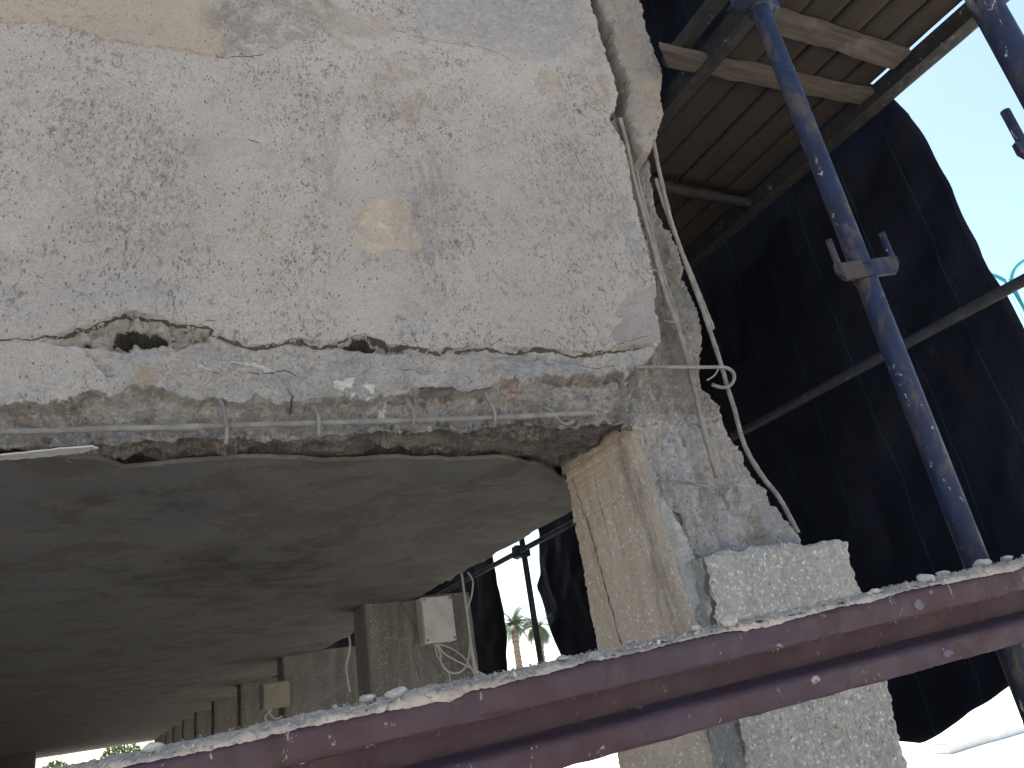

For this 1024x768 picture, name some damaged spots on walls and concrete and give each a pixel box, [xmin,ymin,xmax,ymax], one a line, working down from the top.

crack [0,289,646,359]
spalling [0,83,801,619]